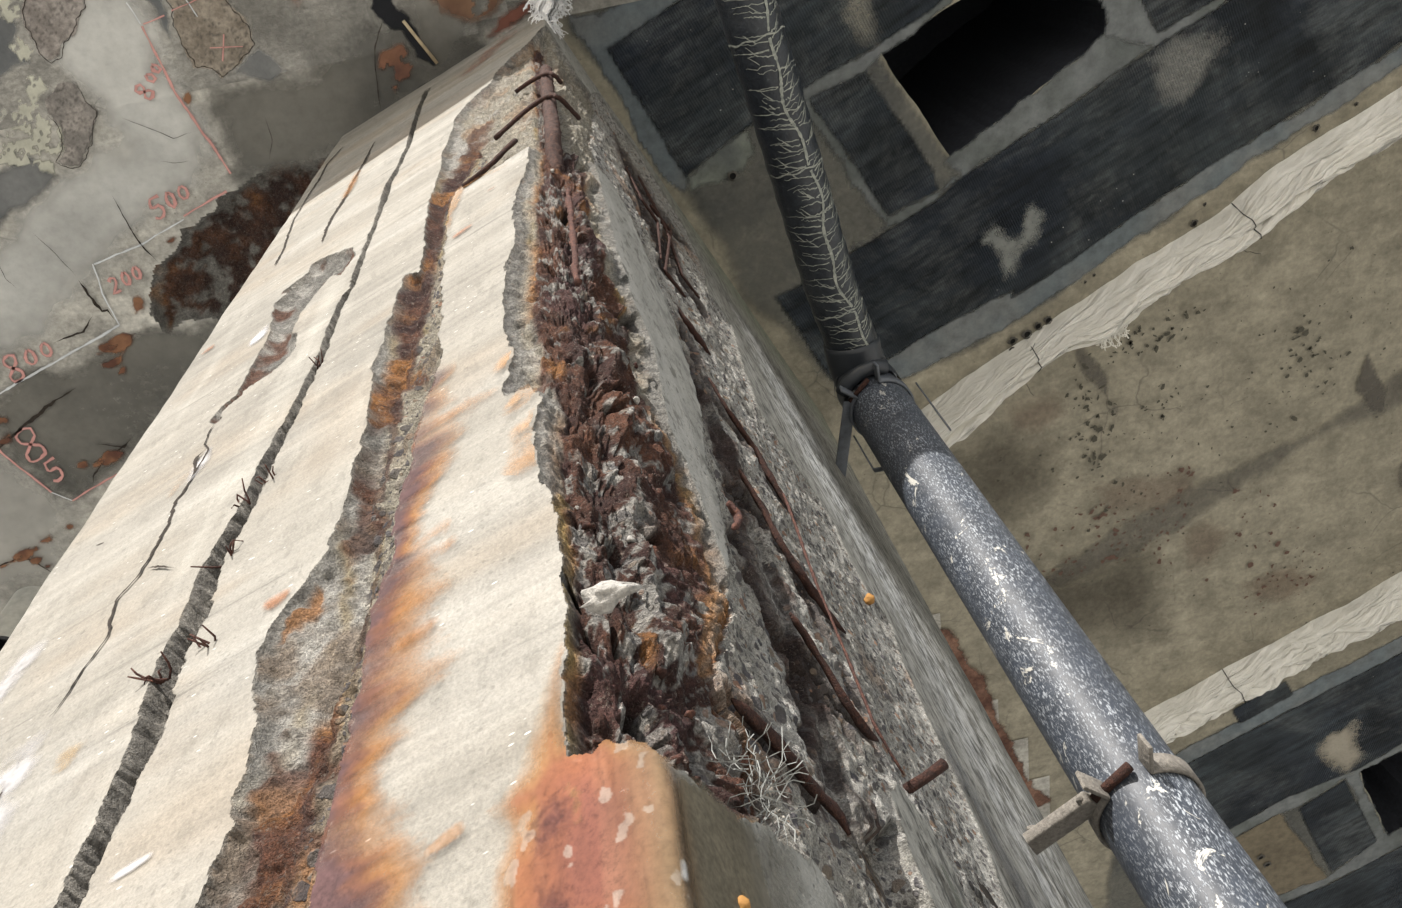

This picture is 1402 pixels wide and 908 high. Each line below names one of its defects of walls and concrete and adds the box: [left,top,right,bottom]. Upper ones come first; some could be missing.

crack [33,233,114,342]
spalling [148,154,329,330]
corrosion [565,188,582,287]
crack [0,389,73,448]
crack [51,87,431,908]
spalling [194,25,1008,908]
corrosion [308,375,453,908]
corrosion [500,656,693,908]